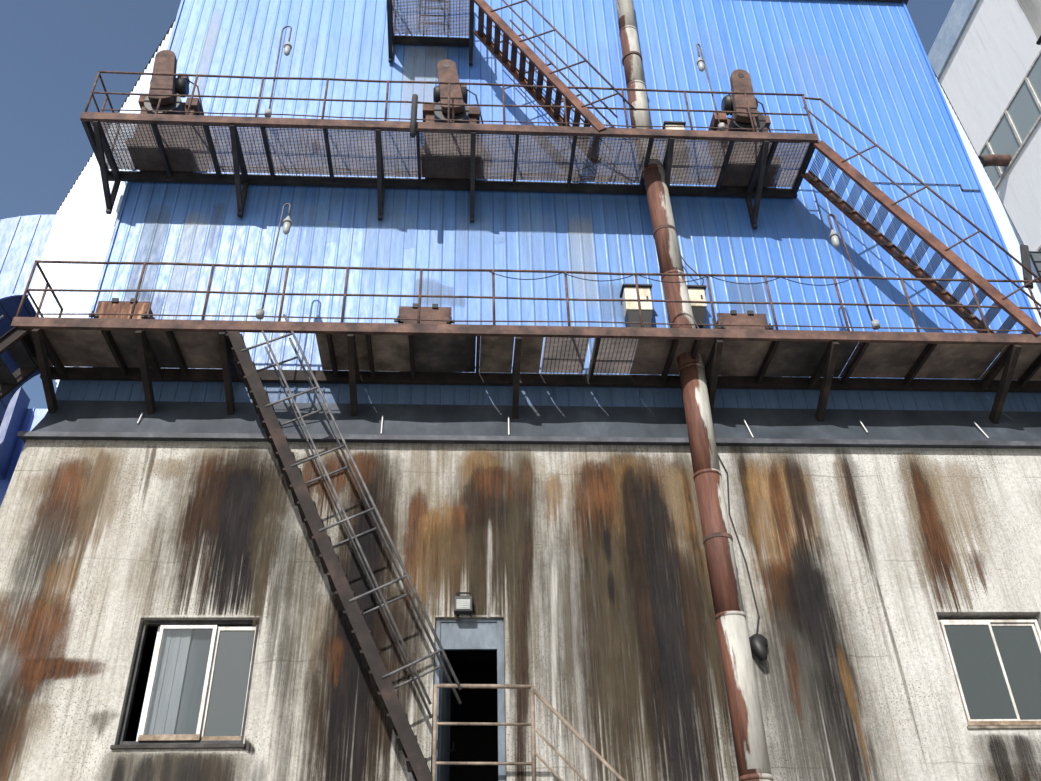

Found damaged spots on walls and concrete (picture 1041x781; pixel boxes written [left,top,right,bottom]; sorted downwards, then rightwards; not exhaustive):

corrosion [0,460,108,781]
water stain [112,757,231,781]
water stain [180,458,286,625]
water stain [312,596,392,781]
water stain [304,453,418,711]
corrosion [403,452,533,781]
corrosion [547,478,560,525]
water stain [738,454,762,574]
corrosion [747,458,872,781]
corrosion [911,465,986,612]
water stain [990,736,1036,781]